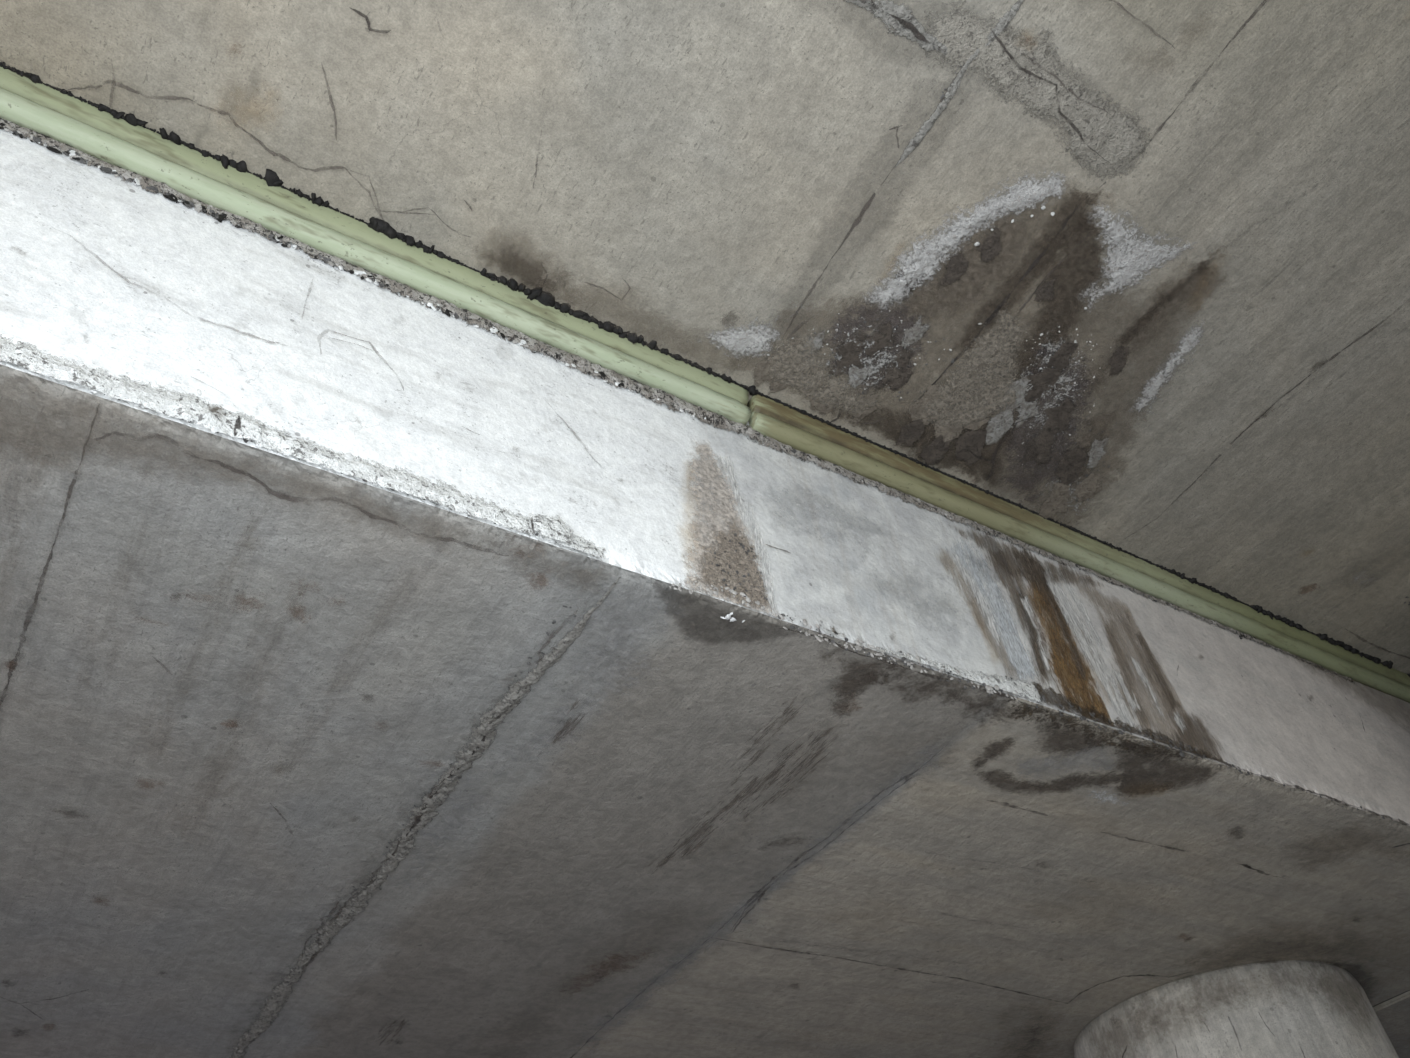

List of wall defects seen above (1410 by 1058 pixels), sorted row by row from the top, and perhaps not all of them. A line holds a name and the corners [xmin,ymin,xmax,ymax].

crack [788,0,1024,339]
crack [0,405,99,705]
crack [230,577,620,1058]
damp [648,530,1223,875]
damp [686,172,1225,526]
corrosion [1026,557,1114,726]
crack [1187,327,1375,489]